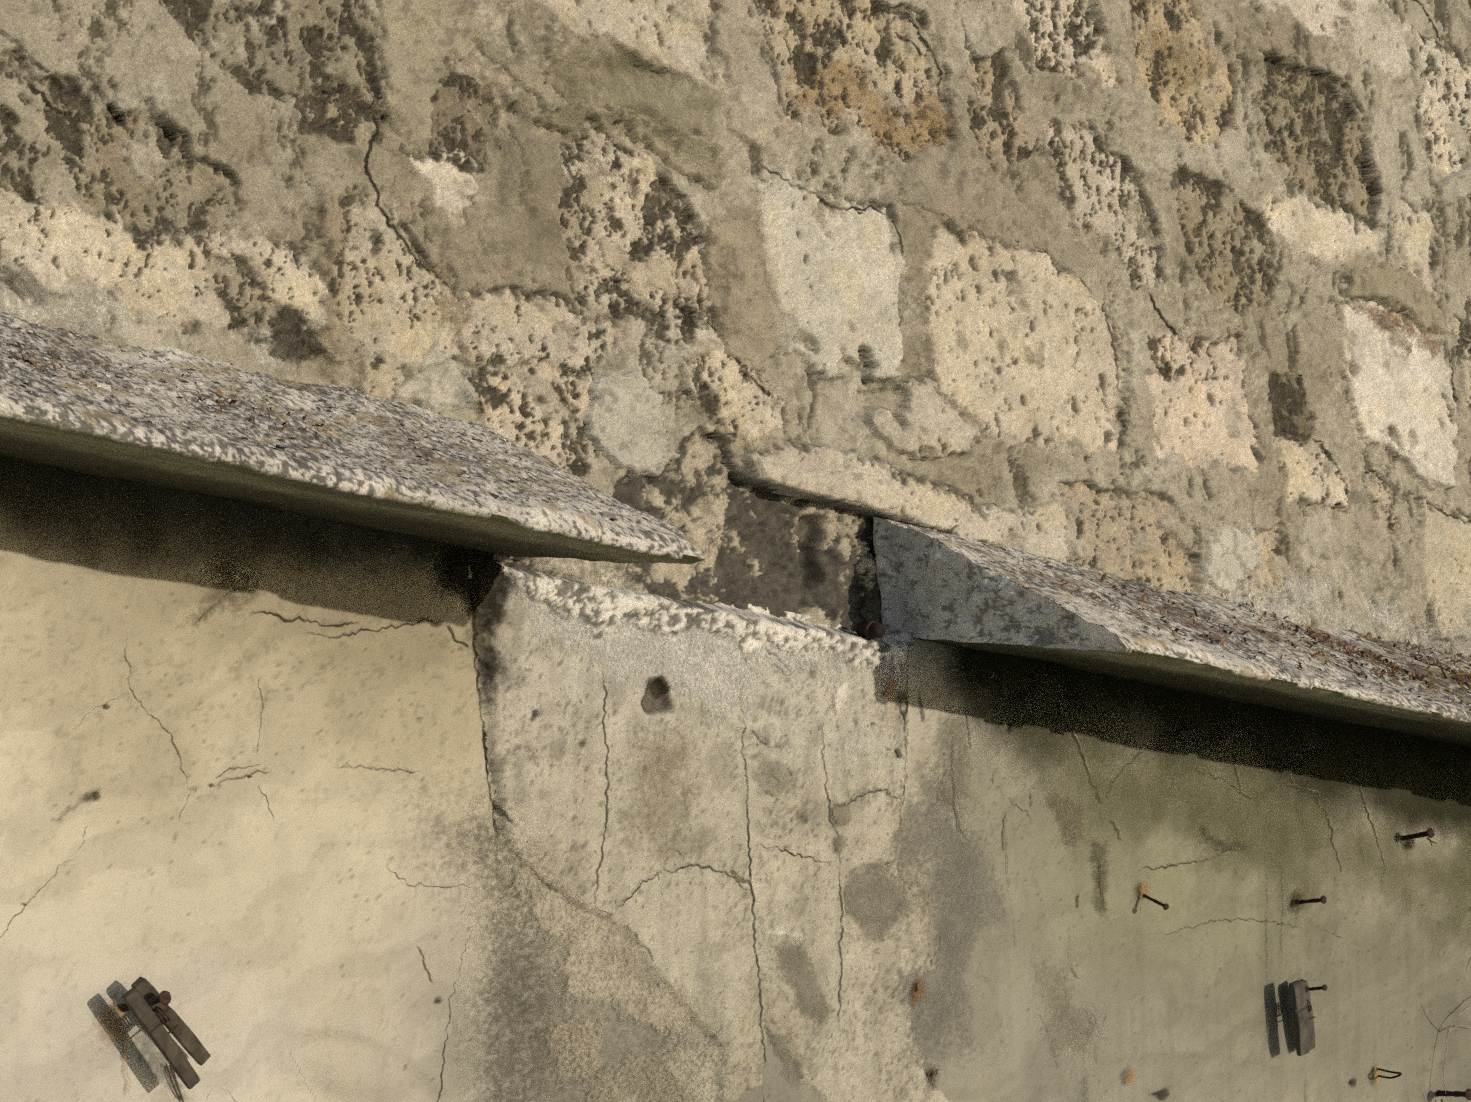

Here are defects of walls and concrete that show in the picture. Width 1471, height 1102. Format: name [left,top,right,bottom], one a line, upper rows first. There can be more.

crack [1,866,59,937]
crack [256,595,513,845]
crack [418,947,453,1102]
peeling [477,572,952,1102]
crack [532,654,910,1102]
leakage [843,646,1471,1052]